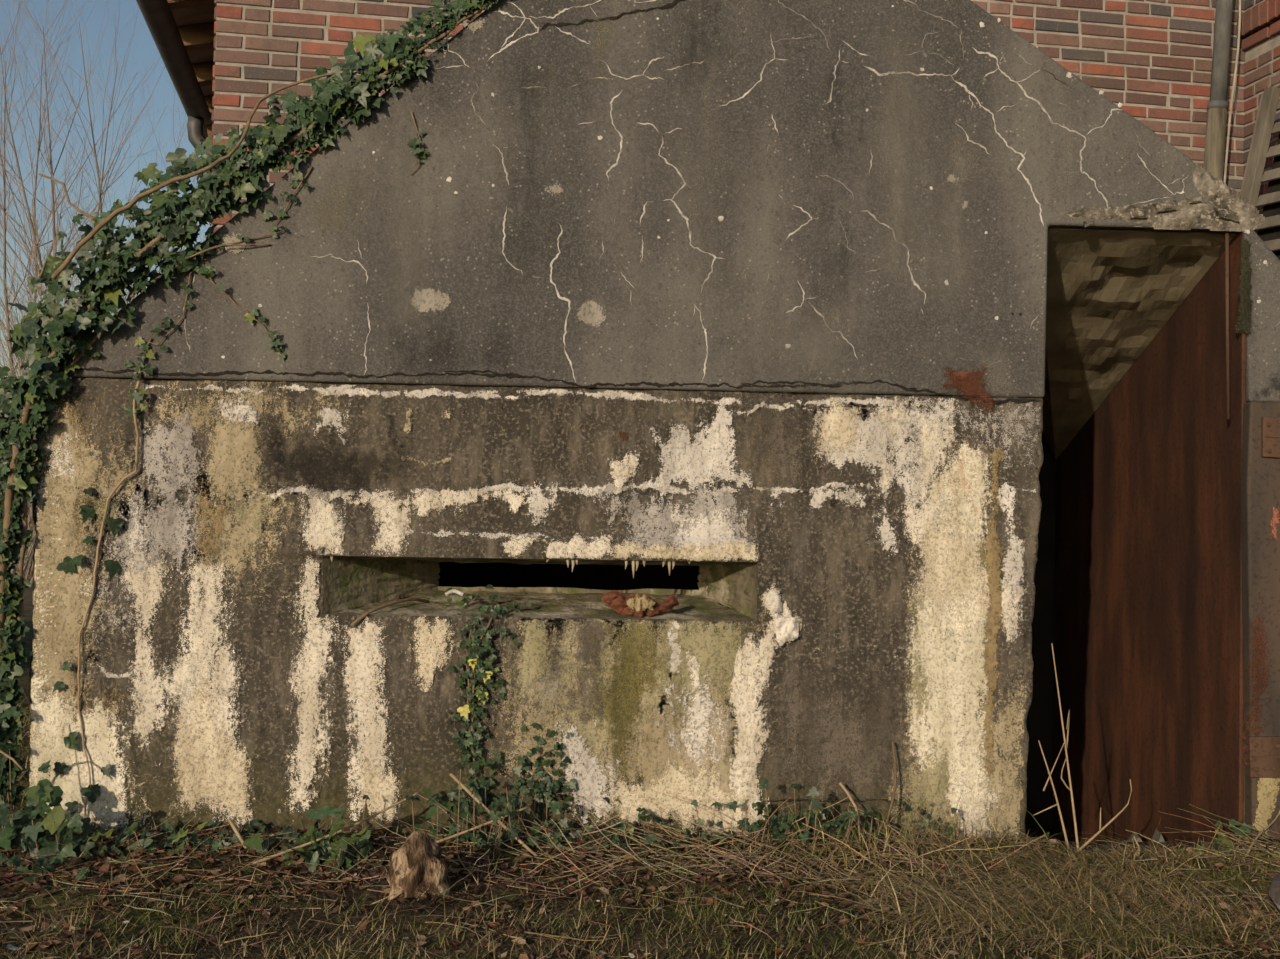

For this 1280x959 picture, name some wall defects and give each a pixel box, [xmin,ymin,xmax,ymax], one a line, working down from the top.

crack [62,0,1188,405]
rust [943,366,995,413]
spalling [1059,164,1265,233]
leakage [28,380,1040,842]